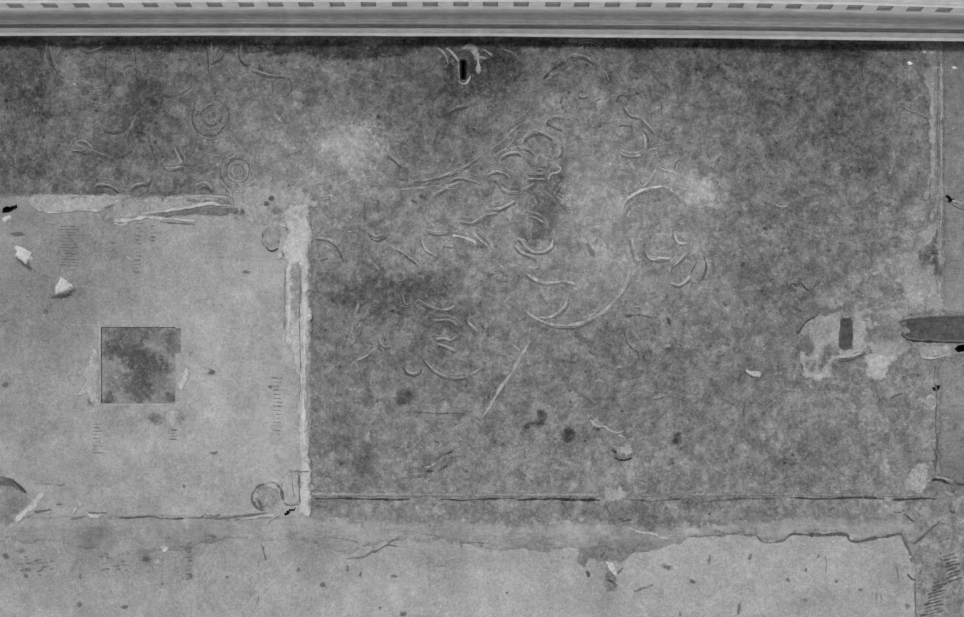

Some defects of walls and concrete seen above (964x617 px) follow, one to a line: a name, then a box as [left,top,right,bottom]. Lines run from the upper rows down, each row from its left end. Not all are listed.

peeling [27,184,319,516]
flaking render [797,44,953,382]
flaking render [577,545,635,591]